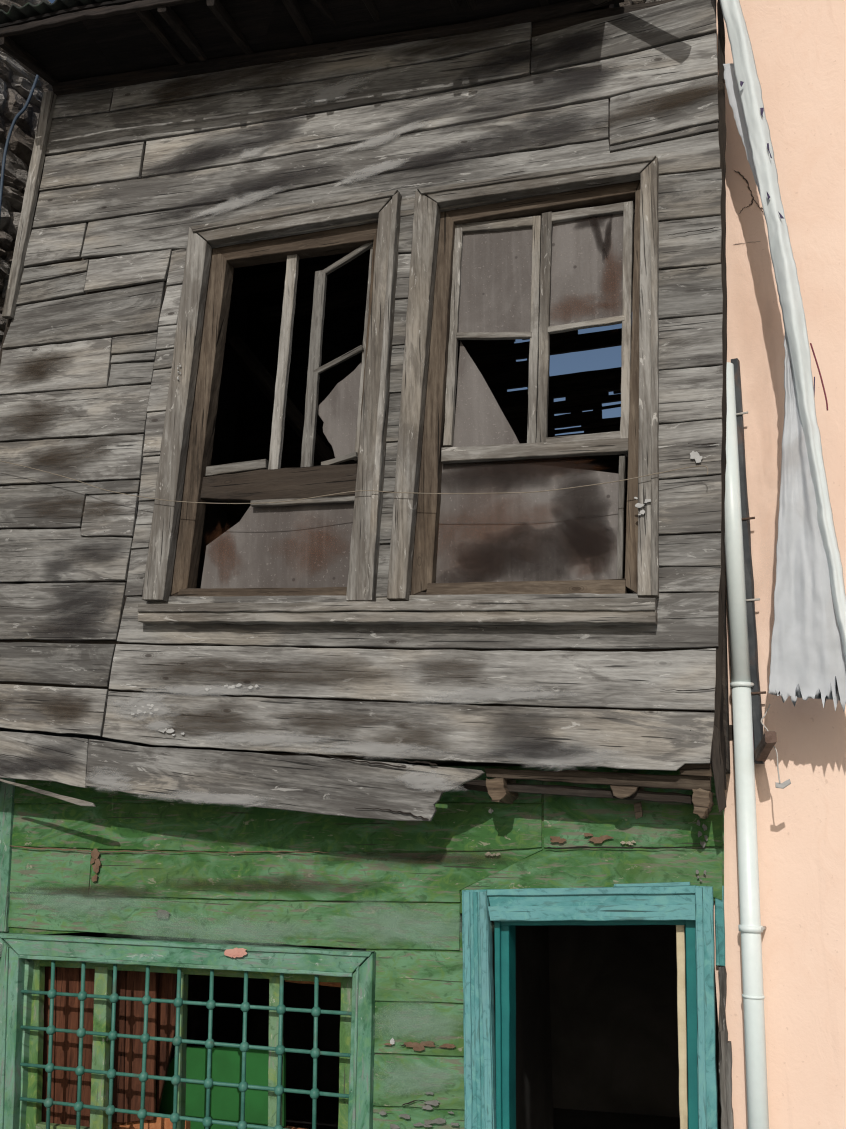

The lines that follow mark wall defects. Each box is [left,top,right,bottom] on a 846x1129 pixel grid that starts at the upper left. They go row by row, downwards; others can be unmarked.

crack [668,170,763,245]
peeling [384,1038,456,1051]
peeling [379,1092,459,1129]